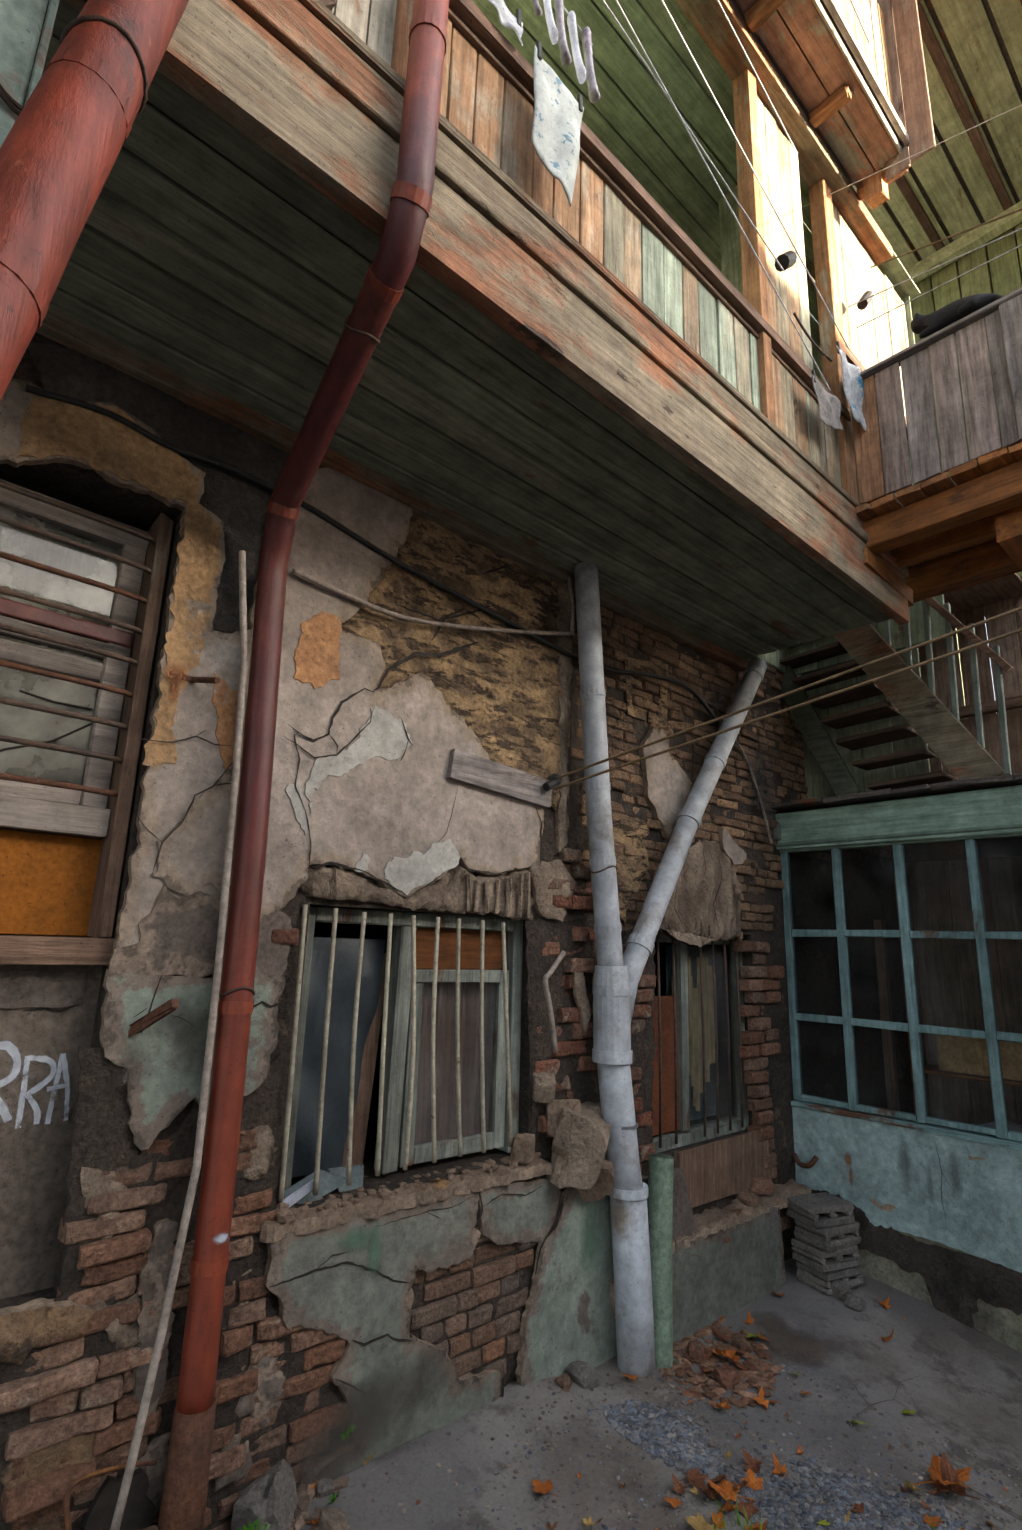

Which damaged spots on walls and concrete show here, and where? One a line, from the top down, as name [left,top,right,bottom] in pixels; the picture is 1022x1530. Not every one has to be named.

peeling [16,396,243,896]
peeling [354,839,461,895]
crack [285,565,543,897]
spalling [285,513,572,835]
spalling [0,1046,205,1530]
spalling [204,1053,352,1530]
crack [269,1185,565,1288]